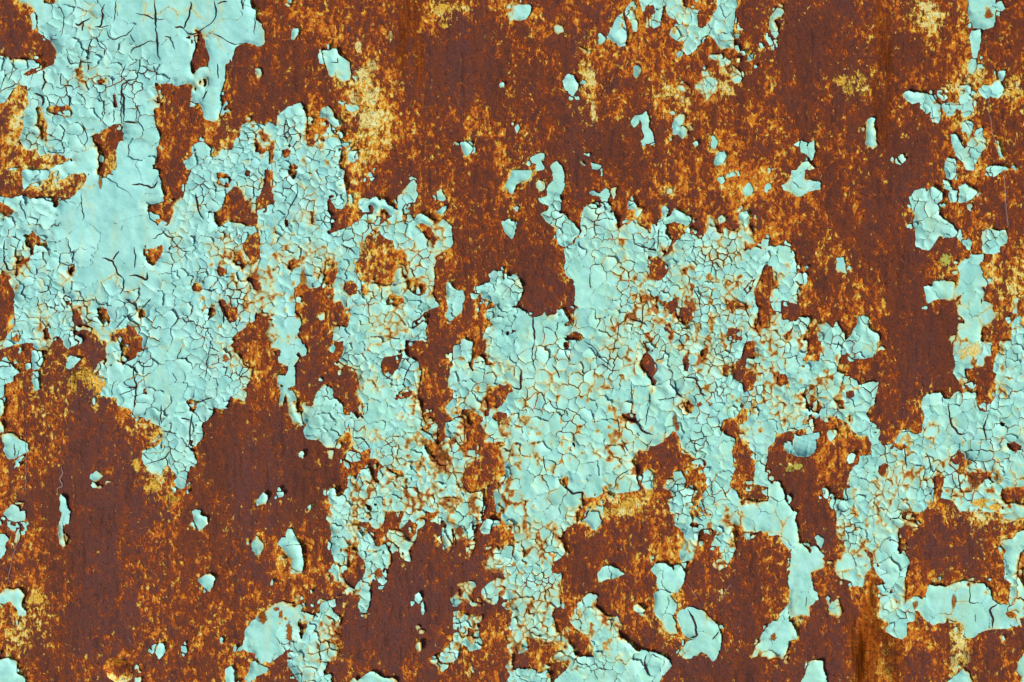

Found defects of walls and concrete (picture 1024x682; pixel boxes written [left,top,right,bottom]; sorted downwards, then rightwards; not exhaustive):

crack [0,0,256,154]
peeling [598,0,784,147]
peeling [904,71,1008,250]
corrosion [67,368,106,396]
crack [38,198,191,329]
crack [111,347,217,464]
peeling [0,0,483,617]
crack [512,303,666,417]
peeling [445,161,1024,682]
corrosion [970,497,1001,511]
corrosion [102,658,134,682]
corrosion [257,607,292,645]